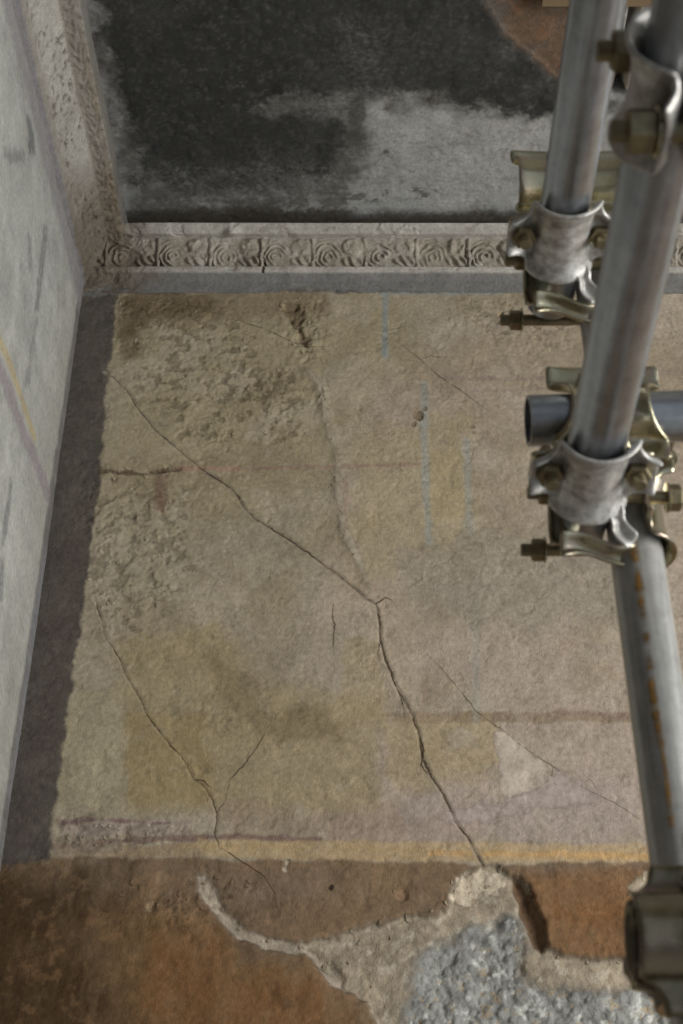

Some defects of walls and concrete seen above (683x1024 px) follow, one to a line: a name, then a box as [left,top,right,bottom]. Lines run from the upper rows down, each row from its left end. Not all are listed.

water stain [126,194,526,223]
crack [104,372,175,447]
crack [198,466,486,867]
crack [196,713,279,910]
flaking render [197,865,670,1024]